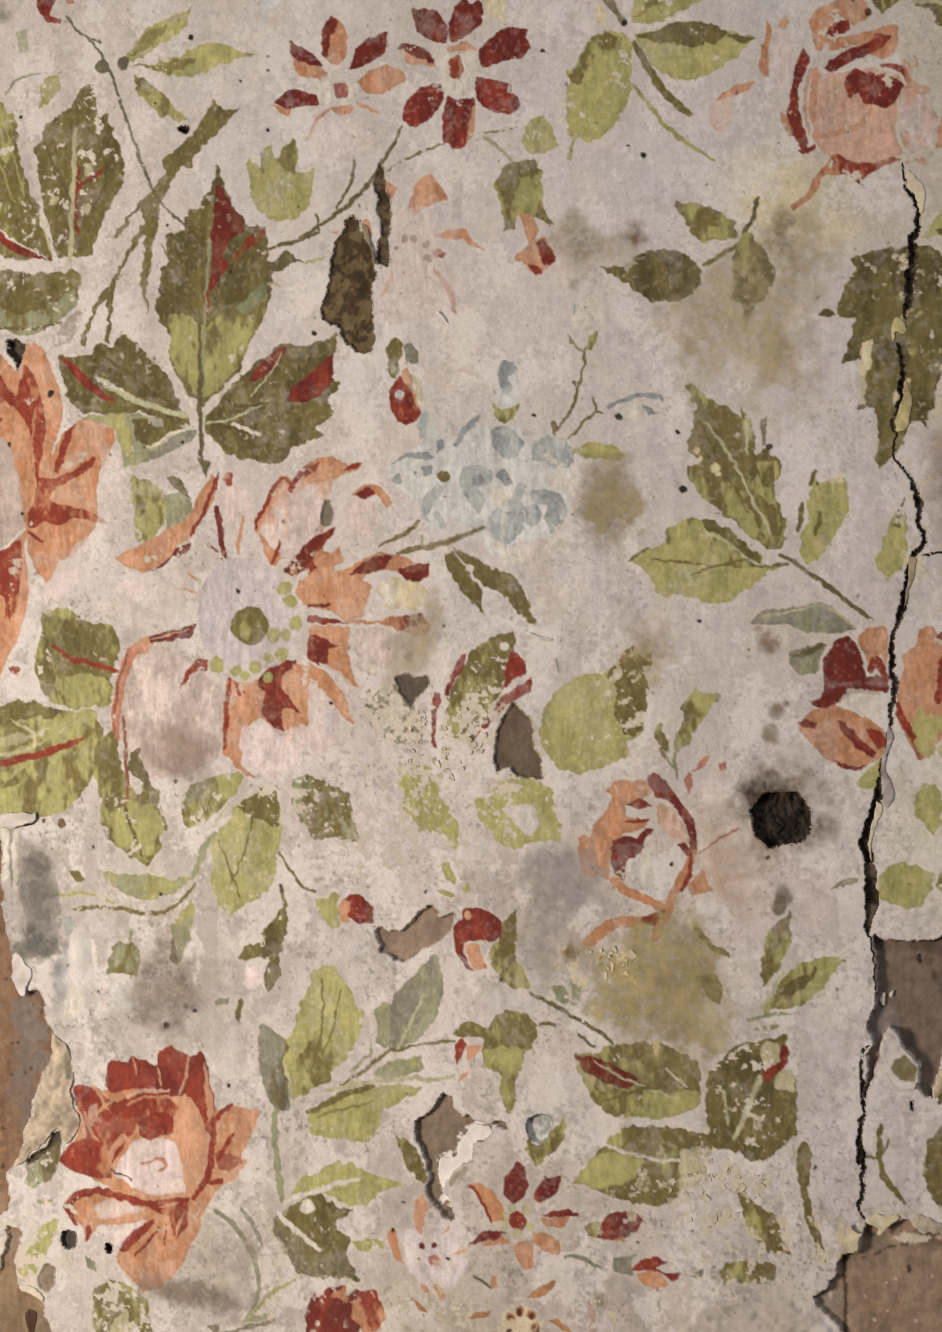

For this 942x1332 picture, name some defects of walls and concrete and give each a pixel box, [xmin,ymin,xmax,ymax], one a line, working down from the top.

crack [858,163,942,991]
peeling [0,812,80,1332]
peeling [373,905,456,963]
peeling [413,1092,510,1223]
crack [856,1045,870,1220]
peeling [862,933,942,1102]
peeling [812,1214,942,1332]